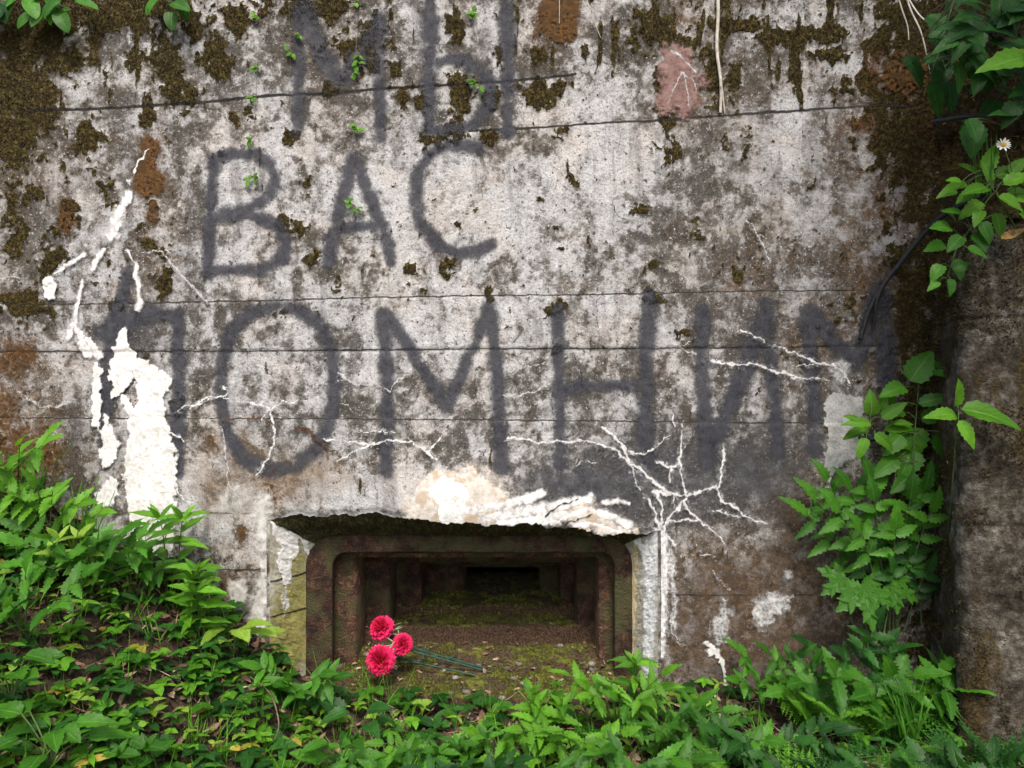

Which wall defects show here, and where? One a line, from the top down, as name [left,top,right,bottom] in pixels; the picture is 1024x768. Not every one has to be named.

corrosion [532,0,582,49]
corrosion [131,133,165,237]
crack [670,329,850,383]
crack [168,372,442,512]
spalling [399,464,639,536]
crack [503,362,767,590]